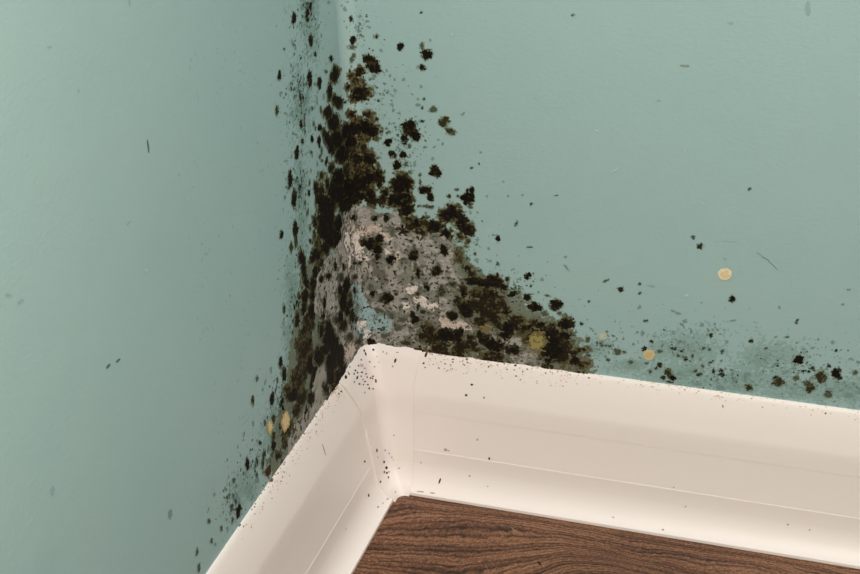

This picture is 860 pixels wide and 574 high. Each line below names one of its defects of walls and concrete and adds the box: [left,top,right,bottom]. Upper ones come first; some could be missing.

peeling [287,205,543,454]
leakage [207,0,860,546]